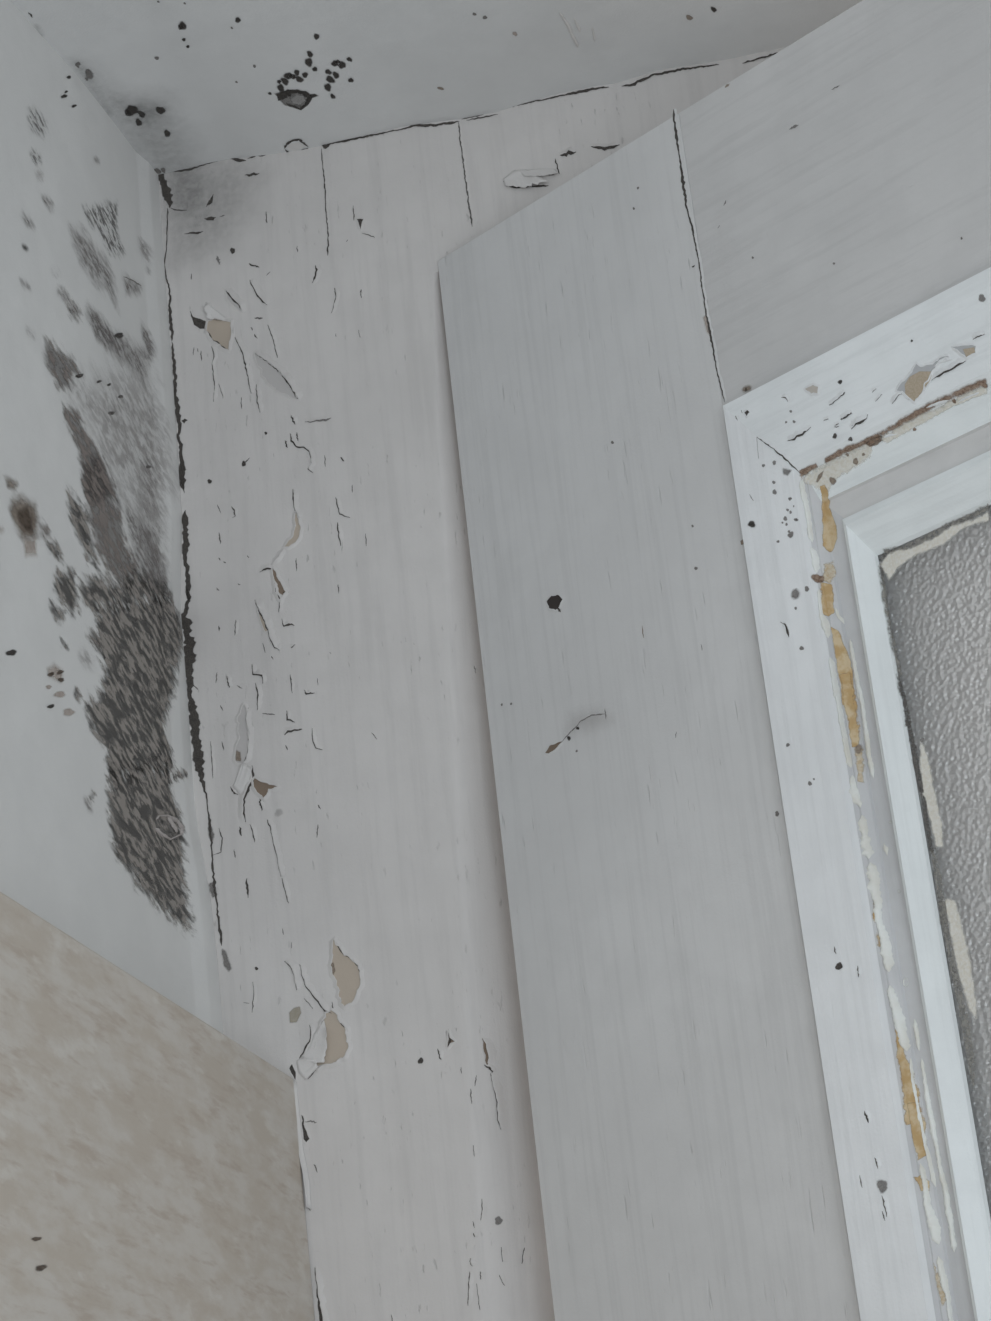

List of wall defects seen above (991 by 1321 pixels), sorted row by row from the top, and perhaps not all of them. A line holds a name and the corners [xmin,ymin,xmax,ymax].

damp [47,341,123,415]
damp [125,106,165,126]
peeling [190,262,303,402]
damp [268,34,354,110]
crack [321,52,778,256]
crack [673,108,727,402]
damp [7,406,191,929]
peeling [210,489,304,824]
crack [158,155,367,1013]
peeling [781,330,988,782]
peeling [282,929,365,1210]
peeling [895,1029,926,1160]